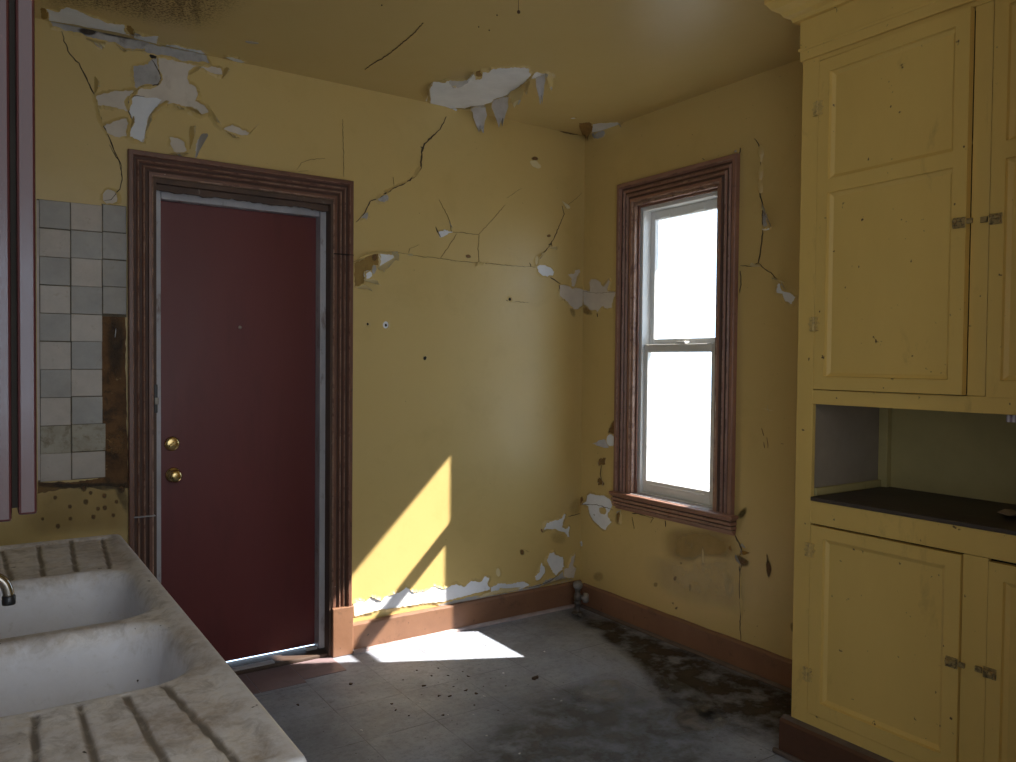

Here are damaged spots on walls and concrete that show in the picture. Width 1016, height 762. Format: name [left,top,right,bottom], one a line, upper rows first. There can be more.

crack [62,33,123,205]
peeling [40,5,256,158]
crack [365,23,423,70]
peeling [426,65,557,133]
crack [356,117,446,222]
peeling [353,250,399,291]
crack [396,195,580,284]
peeling [557,268,616,317]
peeling [352,491,666,618]